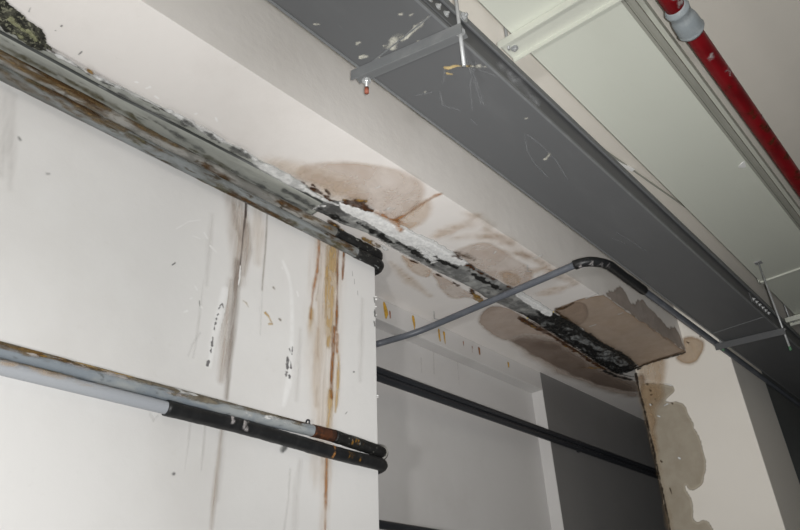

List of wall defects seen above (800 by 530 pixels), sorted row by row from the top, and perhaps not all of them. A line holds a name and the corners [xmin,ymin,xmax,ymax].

mould [0,0,52,51]
corrosion [0,49,179,151]
corrosion [198,162,296,225]
corrosion [301,182,406,231]
corrosion [277,199,353,425]
water stain [470,289,655,442]
water stain [555,287,703,383]
peeling [635,352,713,530]